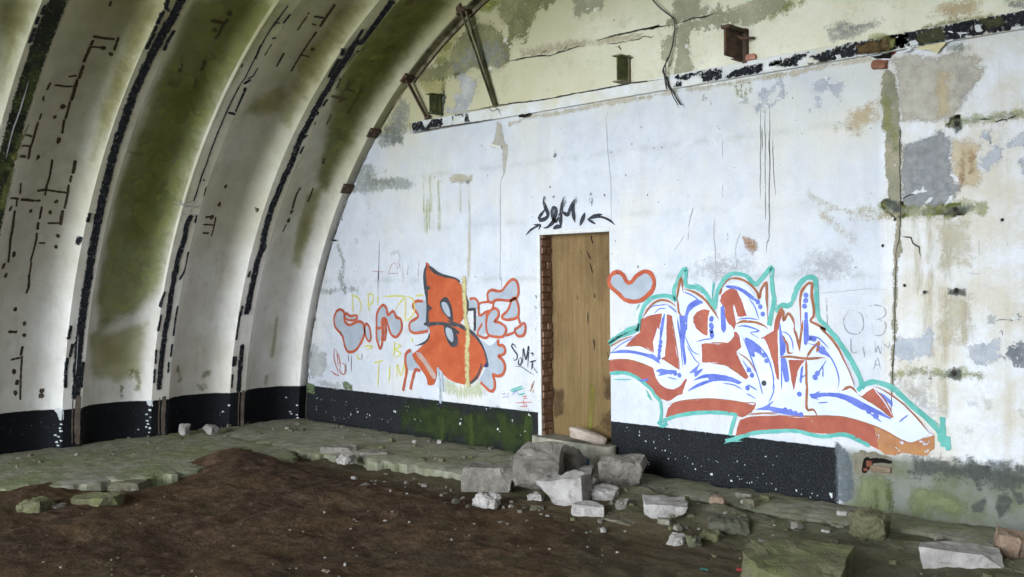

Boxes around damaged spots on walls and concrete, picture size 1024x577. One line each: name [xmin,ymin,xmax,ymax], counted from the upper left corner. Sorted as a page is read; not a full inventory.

peeling [660,0,1024,133]
crack [799,69,921,411]
damp [908,455,1024,517]